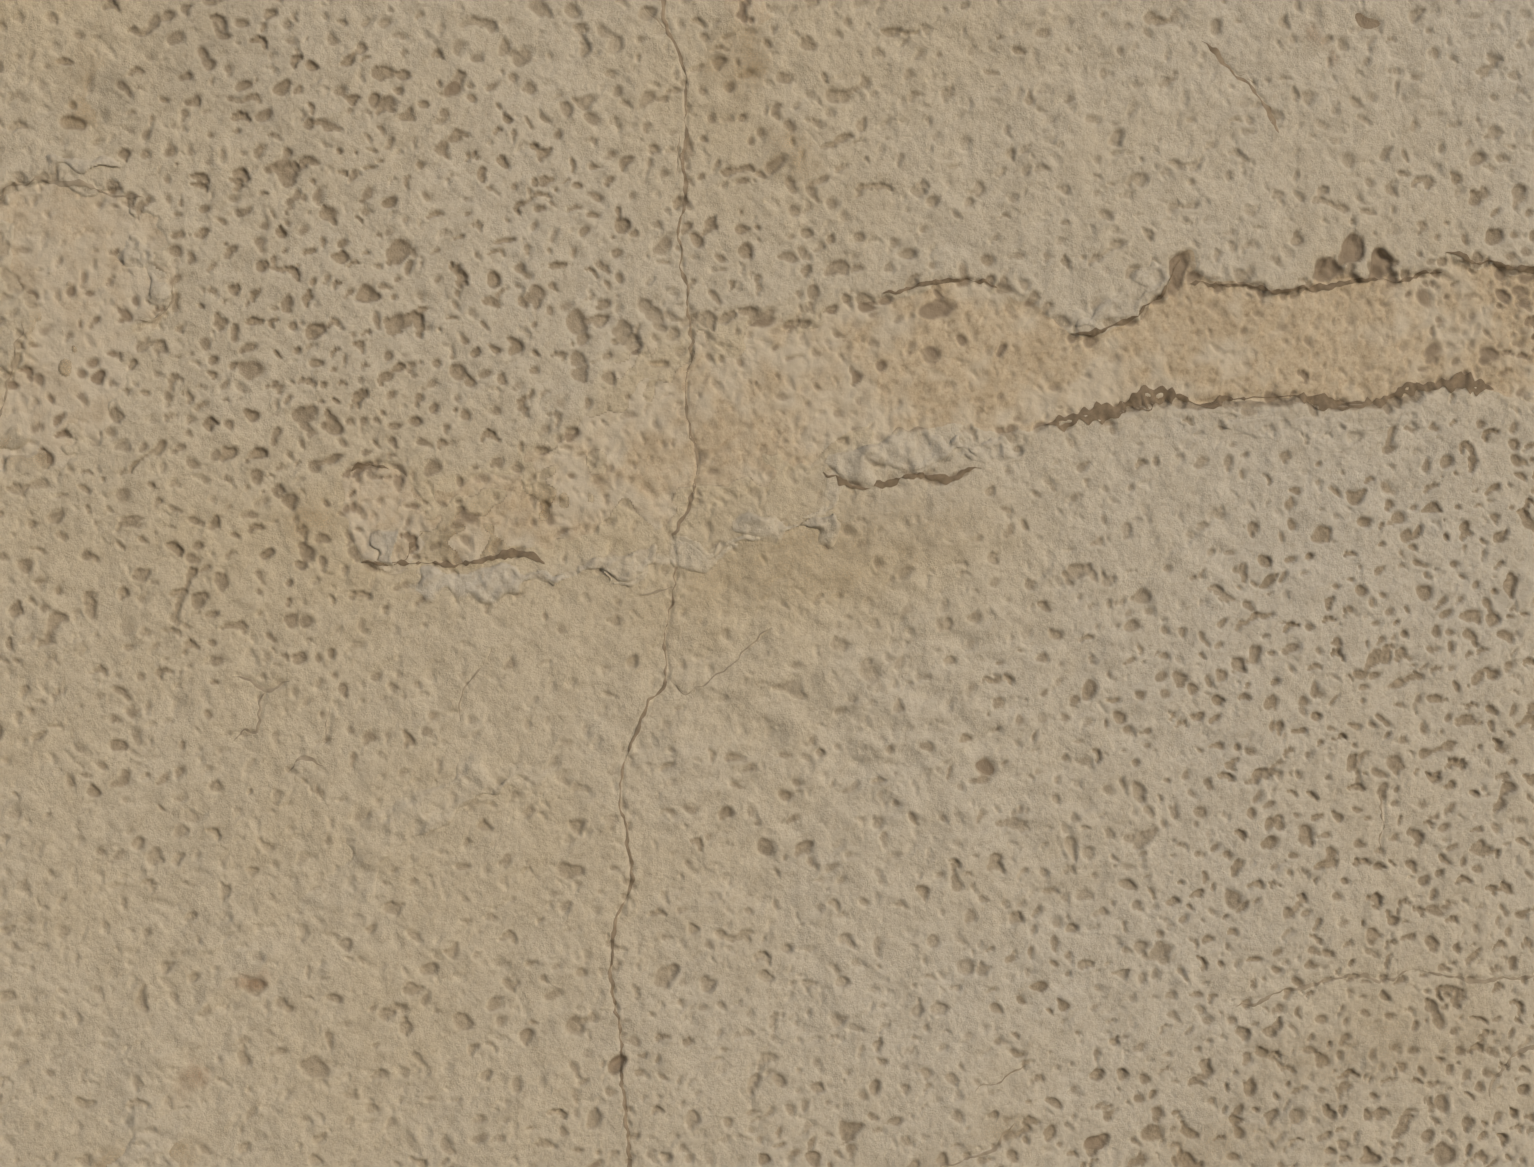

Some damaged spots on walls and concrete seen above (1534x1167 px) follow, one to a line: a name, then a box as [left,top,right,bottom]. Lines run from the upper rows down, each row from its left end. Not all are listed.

crack [607,0,775,1167]
spalling [340,250,1534,605]